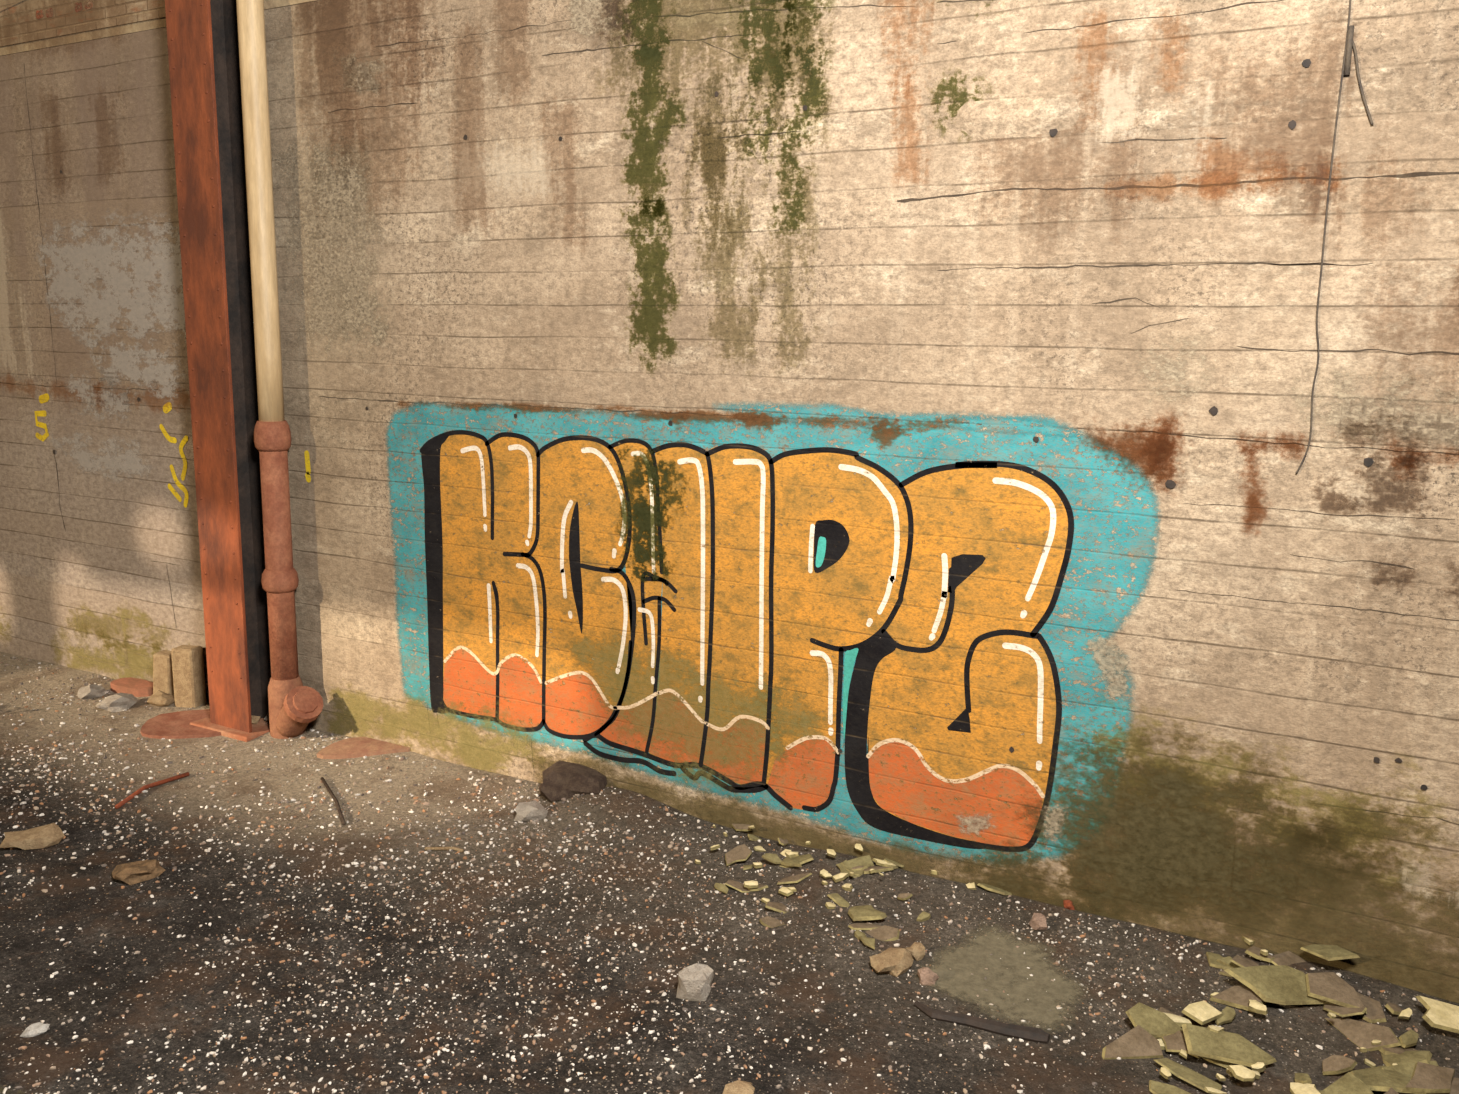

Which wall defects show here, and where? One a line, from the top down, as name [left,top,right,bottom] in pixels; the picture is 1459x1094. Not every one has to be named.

leakage [625,47,683,366]
leakage [750,51,823,229]